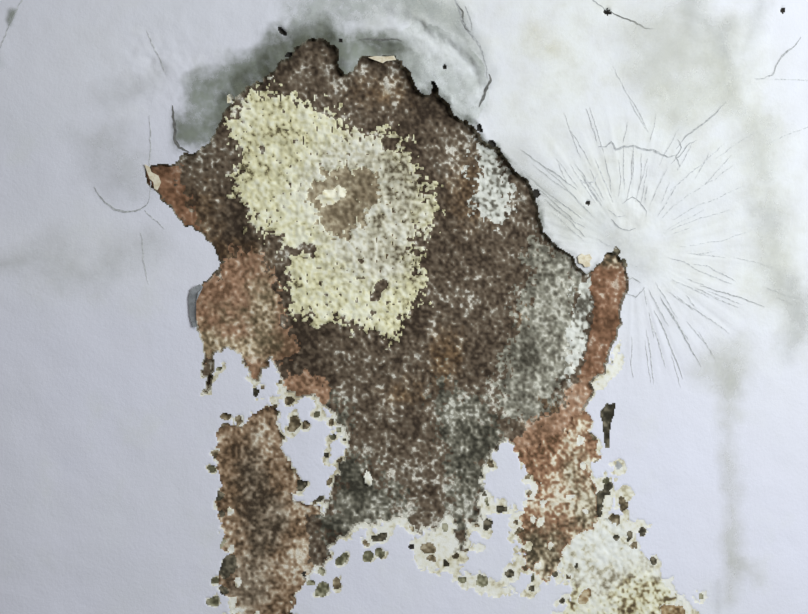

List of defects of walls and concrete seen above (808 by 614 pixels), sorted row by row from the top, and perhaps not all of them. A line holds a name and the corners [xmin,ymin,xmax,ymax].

leakage [175,0,440,144]
crack [455,0,492,107]
crack [593,0,650,29]
crack [760,38,808,81]
crack [520,70,807,385]
spalling [144,38,708,614]